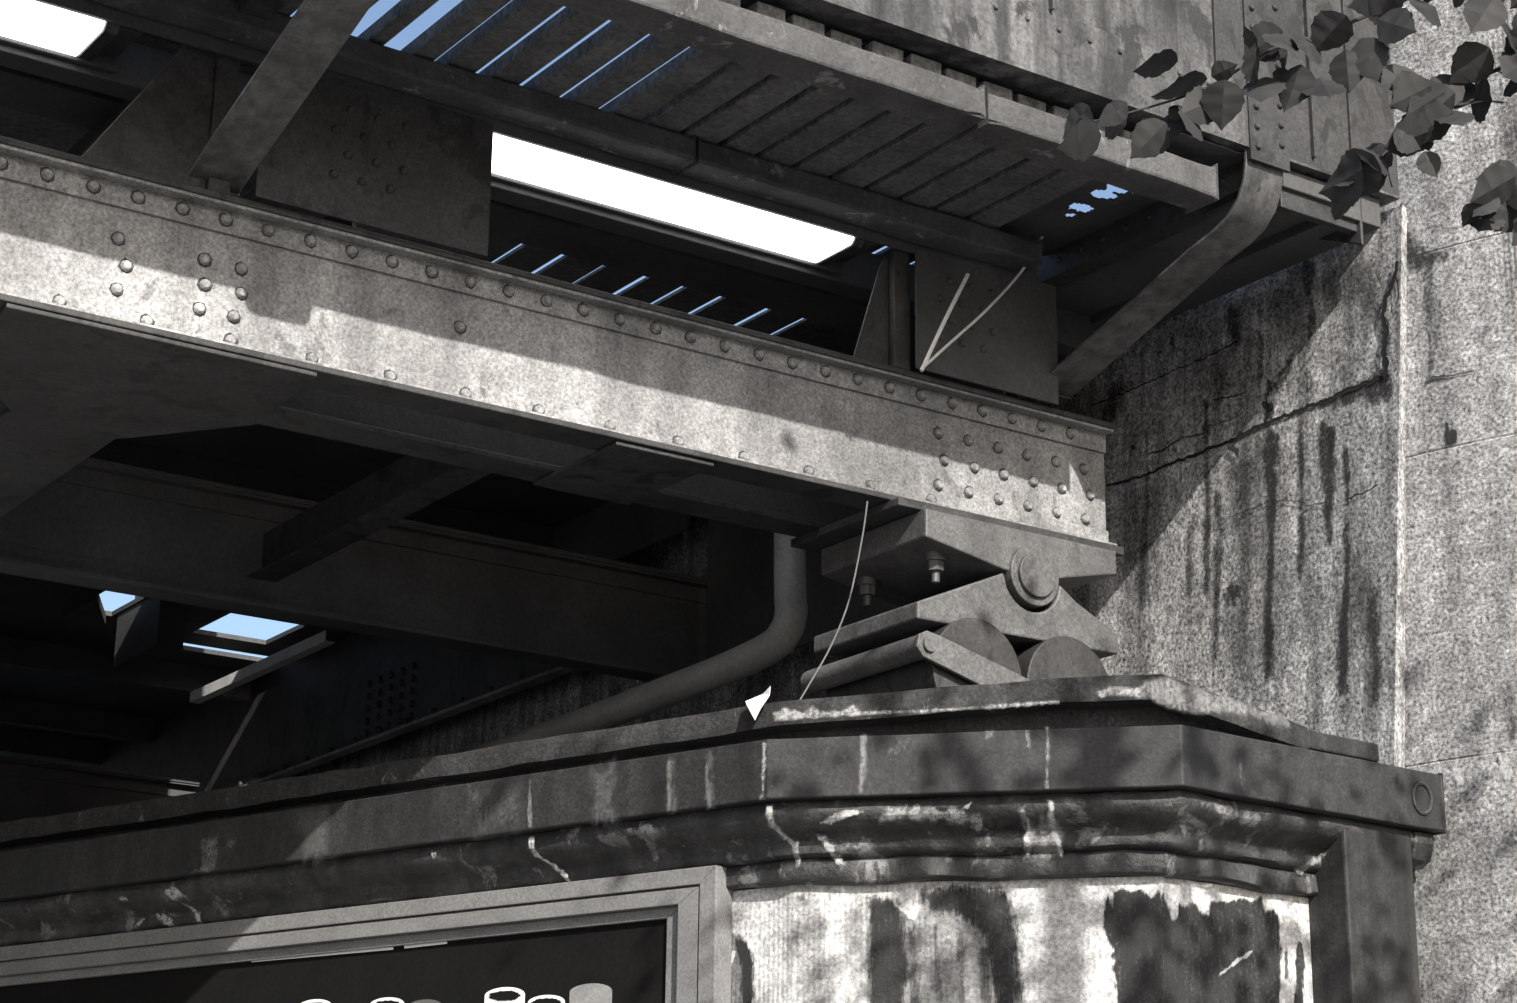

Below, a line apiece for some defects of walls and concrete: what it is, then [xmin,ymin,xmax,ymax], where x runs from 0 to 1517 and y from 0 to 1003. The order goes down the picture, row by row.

crack [1091,231,1473,486]
leakage [1137,433,1153,605]
leakage [1186,400,1224,659]
leakage [1224,260,1351,694]
leakage [1368,588,1385,703]
peeling [869,885,1023,1003]
peeling [1104,884,1305,1003]